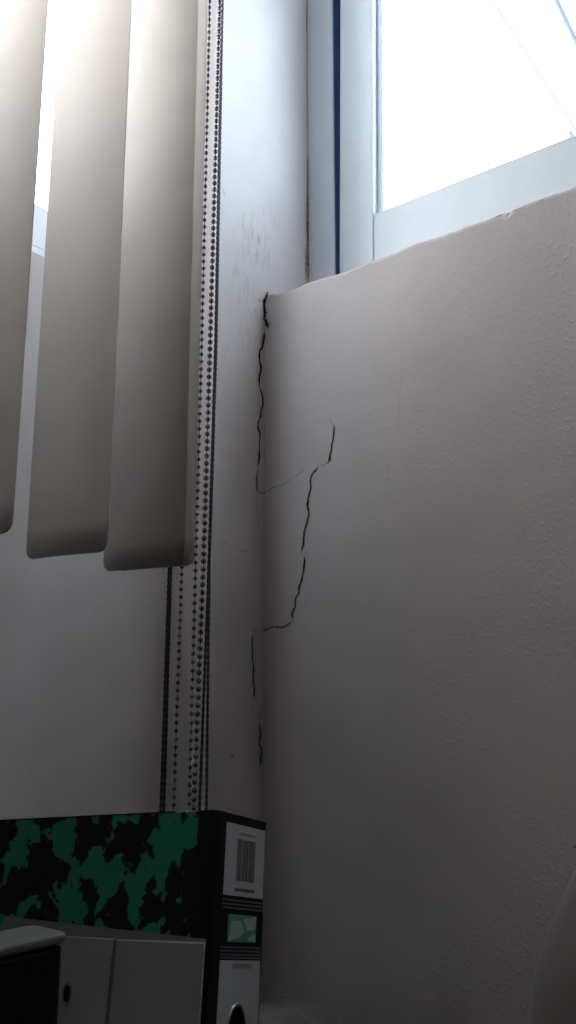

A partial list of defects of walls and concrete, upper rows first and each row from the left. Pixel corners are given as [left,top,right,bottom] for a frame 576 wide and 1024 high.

crack [256,291,269,492]
crack [251,426,335,697]
crack [256,724,264,765]